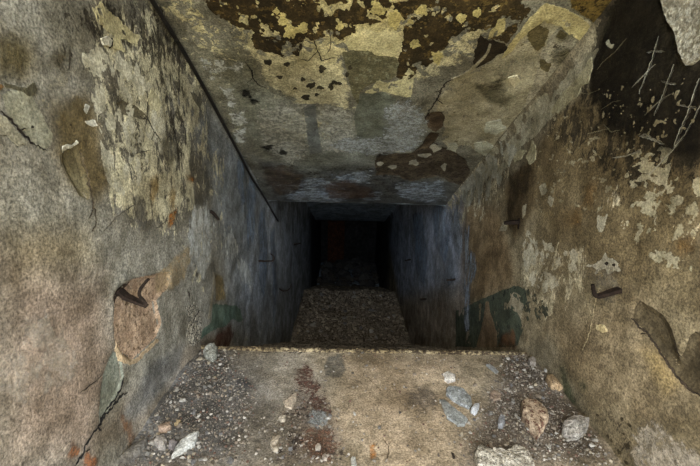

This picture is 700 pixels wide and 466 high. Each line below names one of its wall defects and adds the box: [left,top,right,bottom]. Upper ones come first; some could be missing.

peeling [205,0,531,79]
crack [1,111,47,151]
peeling [82,37,130,196]
flaking render [116,89,147,120]
peeling [293,65,352,101]
spalling [375,111,470,205]
crack [424,79,452,121]
peeling [665,177,700,241]
peeling [648,250,683,269]
flaking render [99,273,171,421]
flaking render [633,301,700,394]
crack [75,377,127,466]